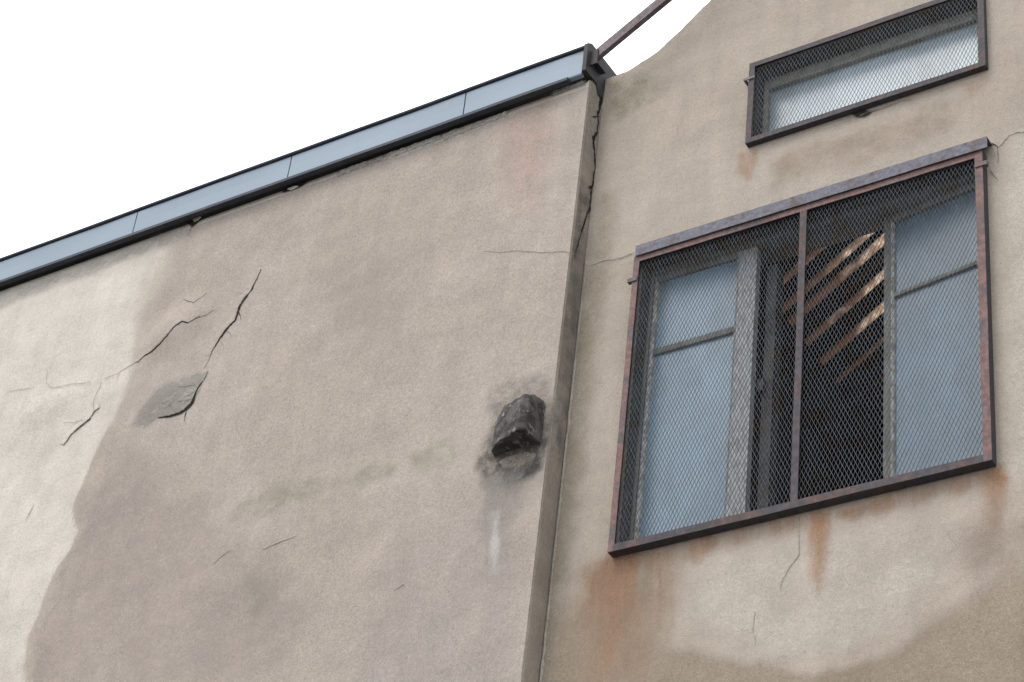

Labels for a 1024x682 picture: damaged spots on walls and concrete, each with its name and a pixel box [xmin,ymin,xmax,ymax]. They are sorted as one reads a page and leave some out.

crack [483,94,632,266]
crack [14,269,261,445]
spalling [136,372,206,427]
damp [18,87,610,682]